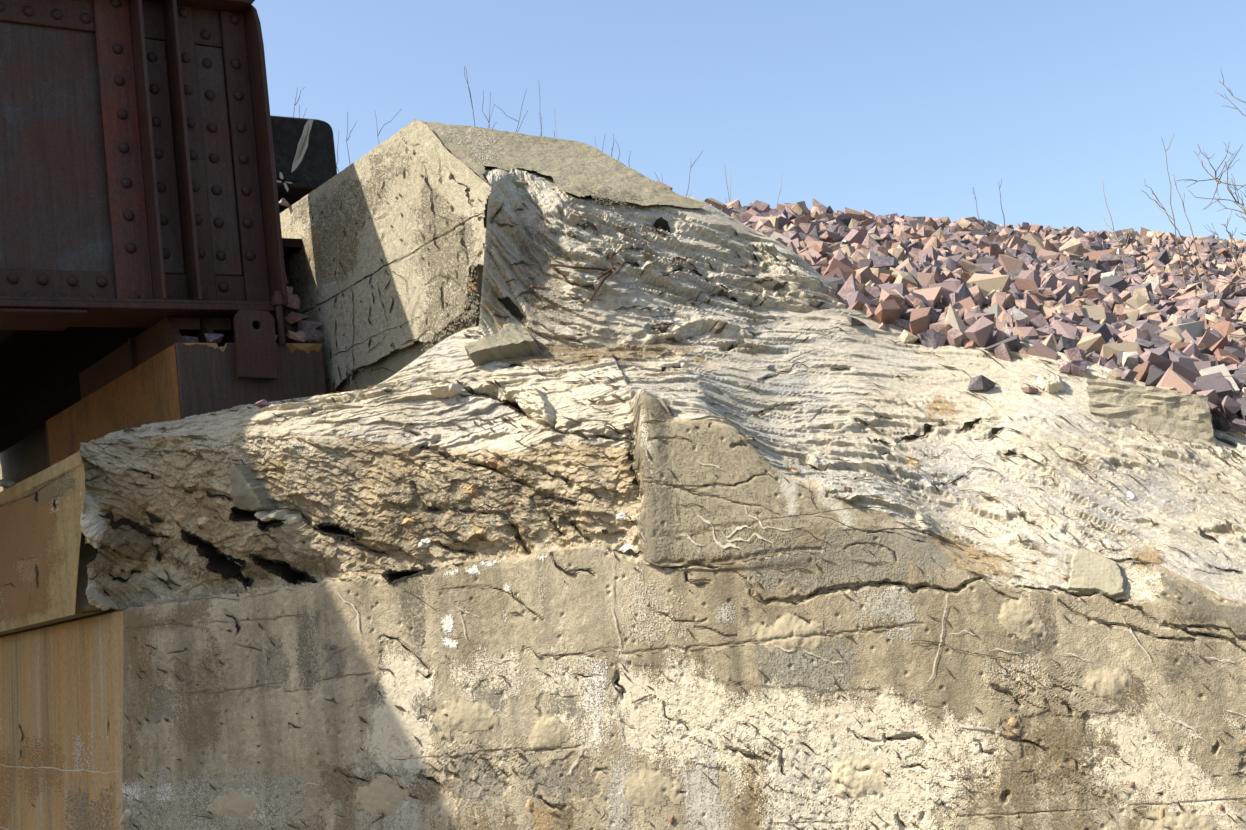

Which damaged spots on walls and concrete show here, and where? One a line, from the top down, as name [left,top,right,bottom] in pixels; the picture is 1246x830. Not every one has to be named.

crack [304,156,479,373]
rust [184,343,227,352]
spalling [104,147,1246,611]
water stain [364,457,579,655]
crack [401,419,1246,730]
water stain [281,739,534,830]
water stain [440,612,644,830]
crack [539,797,565,810]
crack [566,747,608,775]
water stain [675,726,860,830]
crack [729,743,814,775]
crack [849,729,925,770]